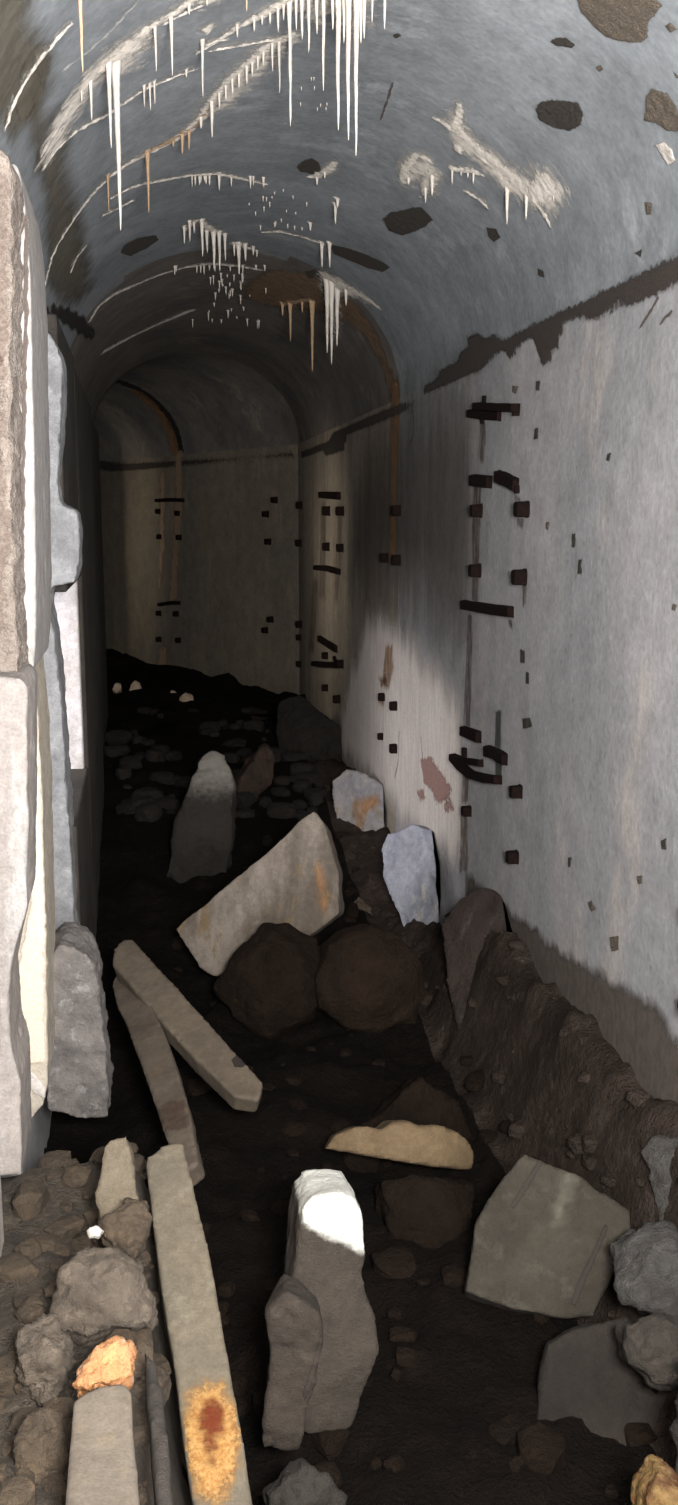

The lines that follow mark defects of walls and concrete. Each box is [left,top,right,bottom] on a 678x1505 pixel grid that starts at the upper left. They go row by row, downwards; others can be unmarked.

spalling [578,0,676,43]
spalling [536,100,583,131]
spalling [644,89,678,165]
damp [0,0,387,372]
damp [397,101,568,228]
spalling [383,207,433,235]
corrosion [243,270,399,556]
corrosion [380,645,393,704]
peeling [417,757,454,813]